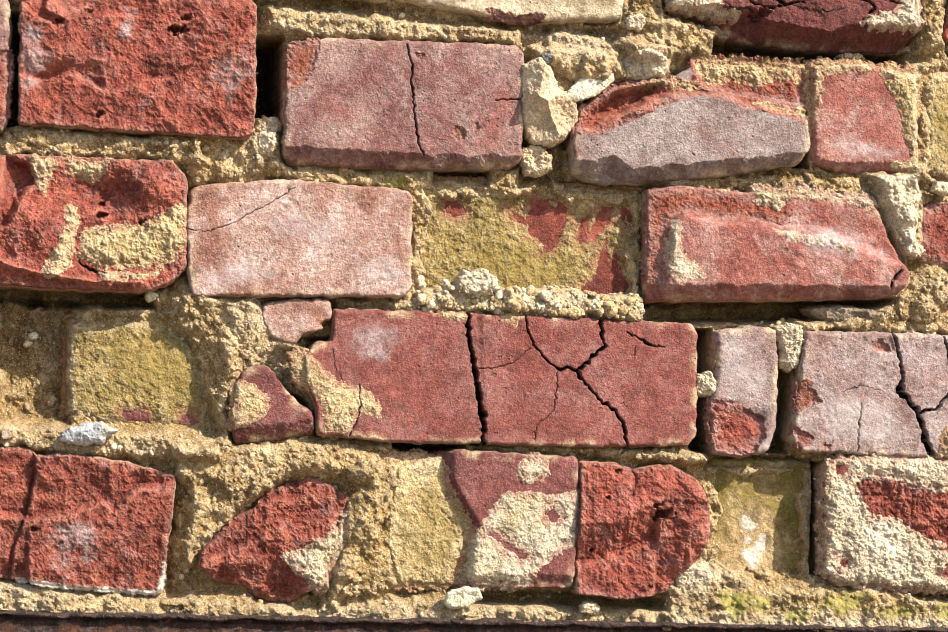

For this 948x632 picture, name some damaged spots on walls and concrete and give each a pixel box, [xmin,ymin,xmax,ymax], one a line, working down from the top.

crack [724,0,897,20]
crack [406,45,424,155]
spalling [567,52,948,184]
spalling [921,200,948,267]
crack [464,316,626,448]
crack [627,332,664,356]
crack [844,337,948,455]
spalling [200,476,350,604]
spalling [381,448,711,610]